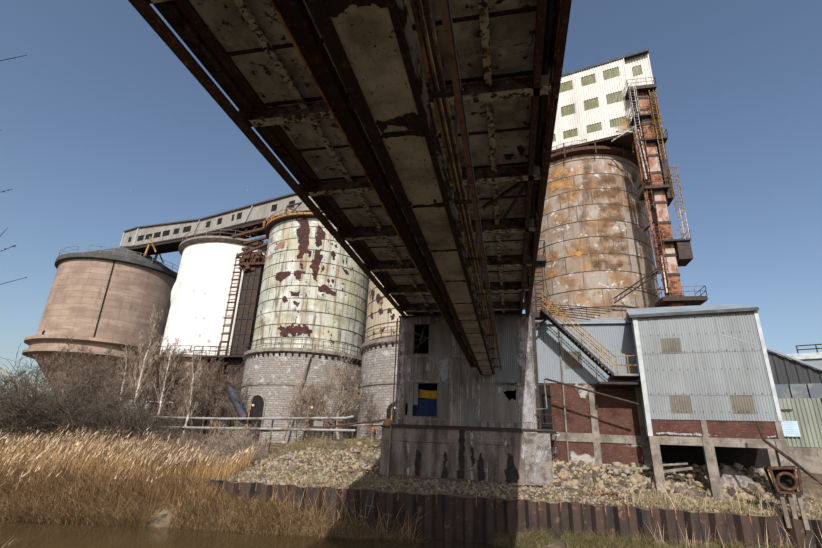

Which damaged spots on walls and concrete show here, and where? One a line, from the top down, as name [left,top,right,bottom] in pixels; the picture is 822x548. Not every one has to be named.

spalling [323,0,388,18]
peeling [275,218,349,296]
peeling [370,290,395,320]
peeling [278,323,312,339]
leakage [406,442,421,476]
leakage [441,430,488,482]